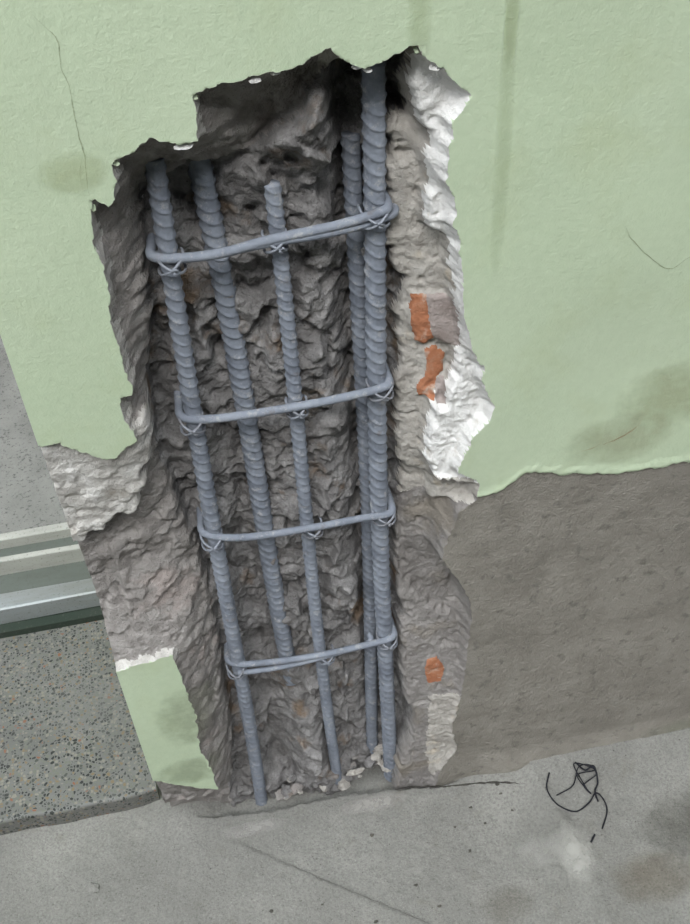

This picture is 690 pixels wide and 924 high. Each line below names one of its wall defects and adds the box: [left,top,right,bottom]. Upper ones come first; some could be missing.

crack [39,21,90,198]
crack [626,228,690,269]
spalling [41,45,495,807]